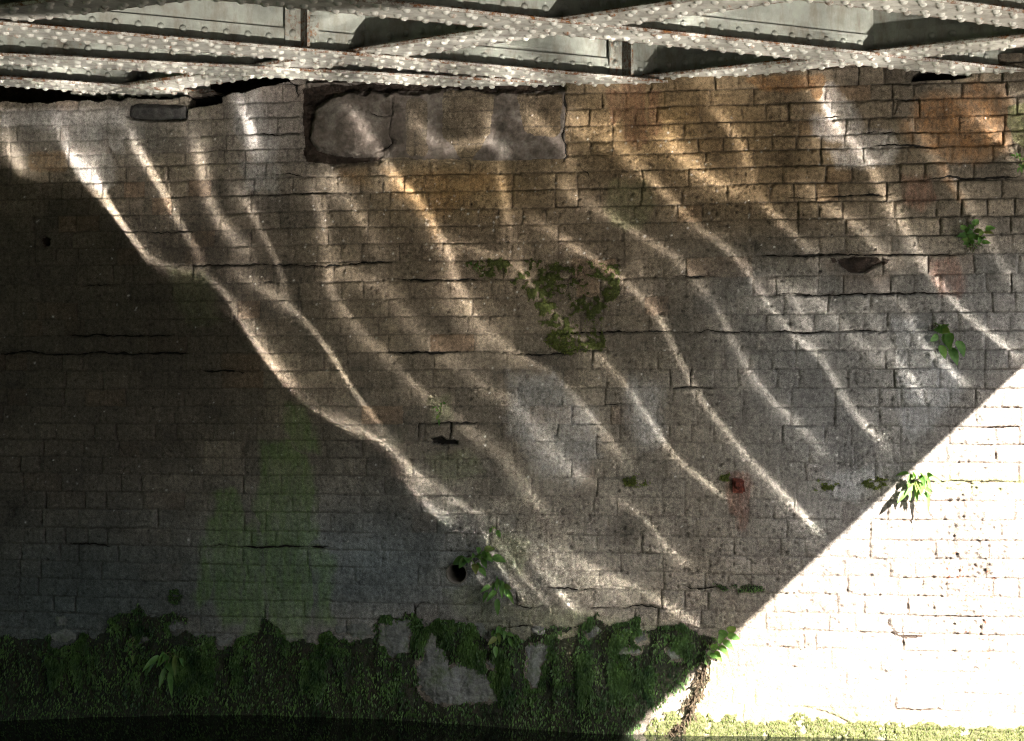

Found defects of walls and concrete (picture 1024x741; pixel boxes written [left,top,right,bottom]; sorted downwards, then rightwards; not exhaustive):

crack [867,99,929,148]
crack [927,173,1015,181]
crack [793,191,881,199]
crack [765,251,953,259]
spalling [830,256,889,273]
crack [4,334,186,356]
crack [394,349,457,357]
crack [512,329,879,356]
rust [722,469,755,534]
crack [210,542,328,550]
leakage [186,482,270,638]
leakage [308,540,343,633]